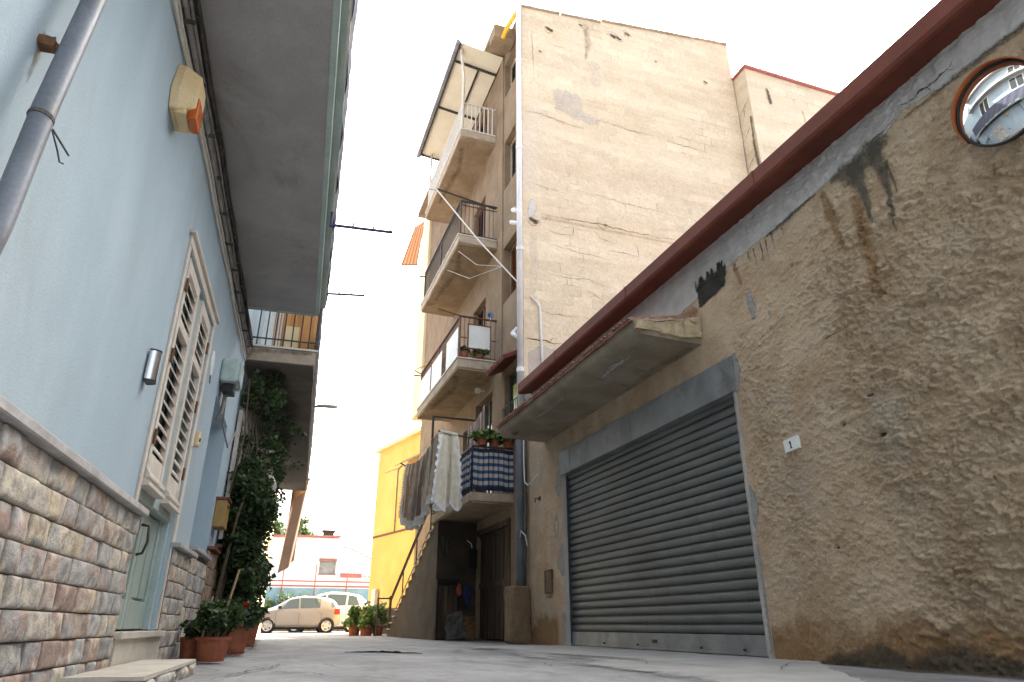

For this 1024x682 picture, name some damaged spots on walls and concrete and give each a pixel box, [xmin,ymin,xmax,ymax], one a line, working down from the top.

crack [865,63,952,146]
crack [533,176,679,300]
water stain [695,260,726,308]
corrosion [819,193,845,248]
water stain [830,135,898,231]
corrosion [852,196,886,297]
water stain [772,618,1024,677]